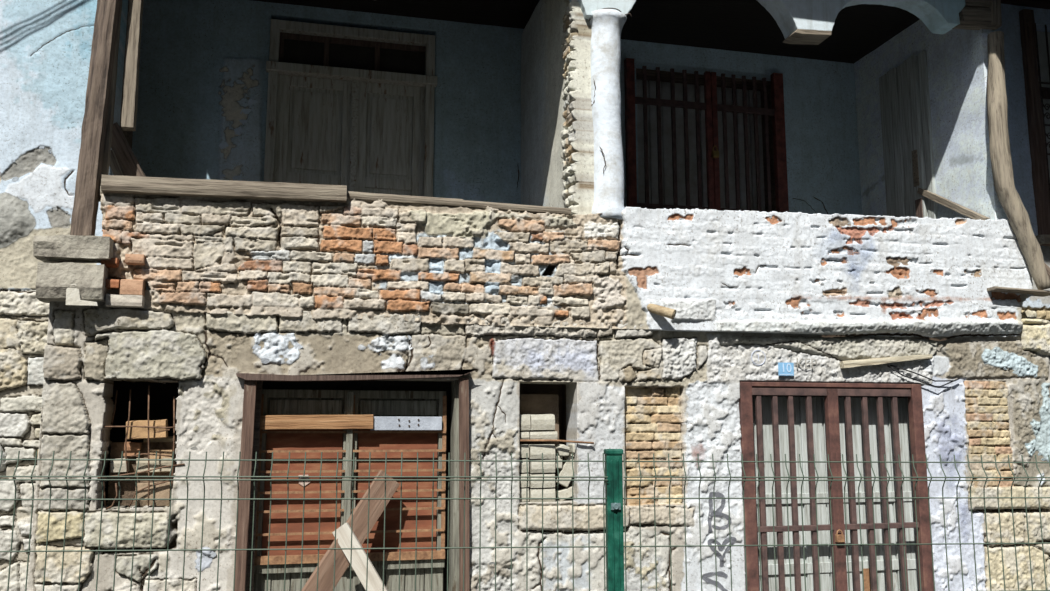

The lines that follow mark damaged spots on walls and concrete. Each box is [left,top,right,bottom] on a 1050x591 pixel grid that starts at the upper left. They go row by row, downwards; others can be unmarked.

flaking render [0,144,56,182]
flaking render [220,165,243,181]
flaking render [46,206,71,228]
peeling [821,217,917,266]
peeling [628,267,659,289]
peeling [734,267,754,276]
peeling [815,257,954,320]
peeling [785,298,810,320]
peeling [963,292,1021,320]
peeling [982,347,1050,485]